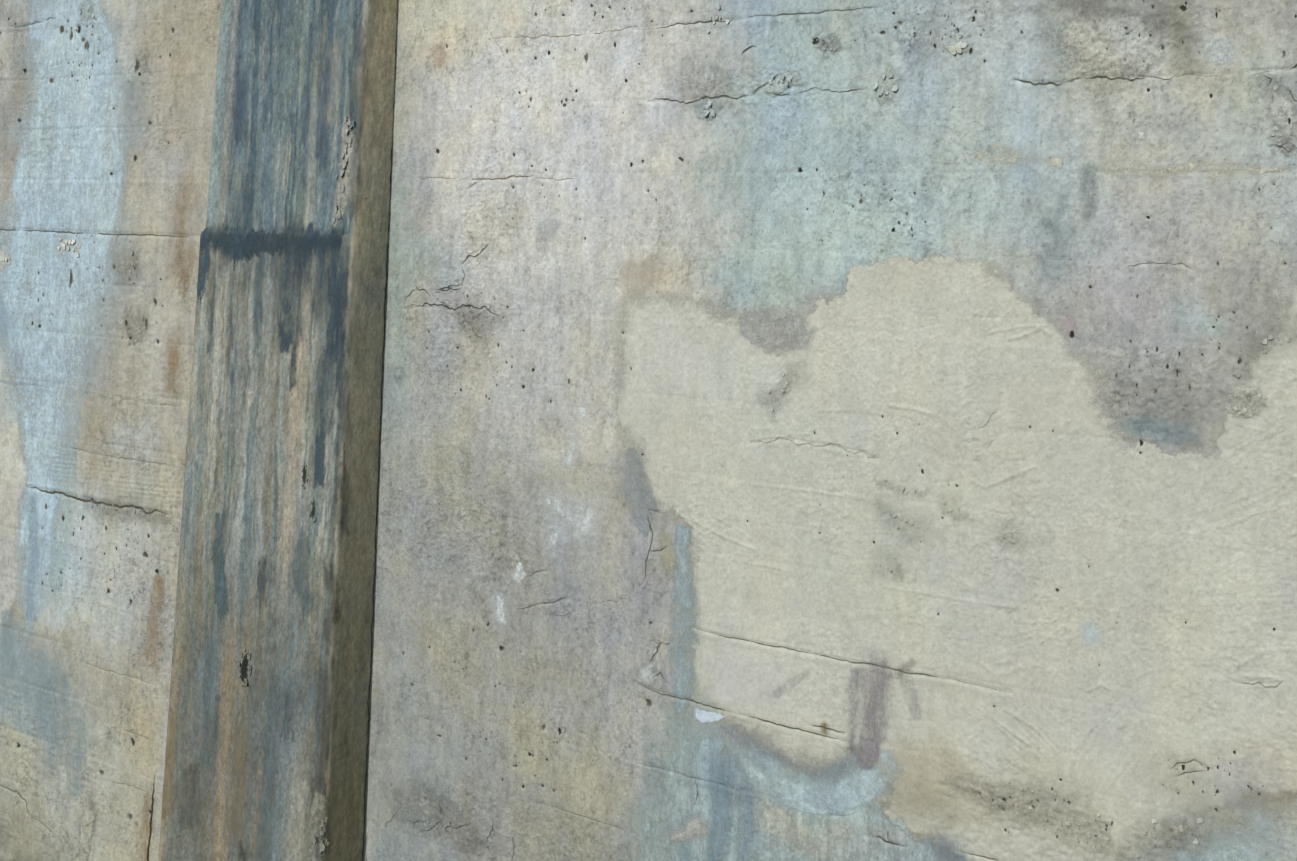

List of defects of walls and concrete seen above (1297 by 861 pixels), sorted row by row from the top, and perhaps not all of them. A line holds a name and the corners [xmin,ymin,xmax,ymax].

crack [484,7,869,58]
crack [651,74,866,104]
crack [1013,73,1217,86]
damp [197,90,365,528]
crack [28,486,168,514]
crack [362,141,514,861]
damp [210,510,228,620]
damp [257,559,266,607]
crack [515,569,573,616]
damp [310,661,333,861]
damp [636,713,952,861]